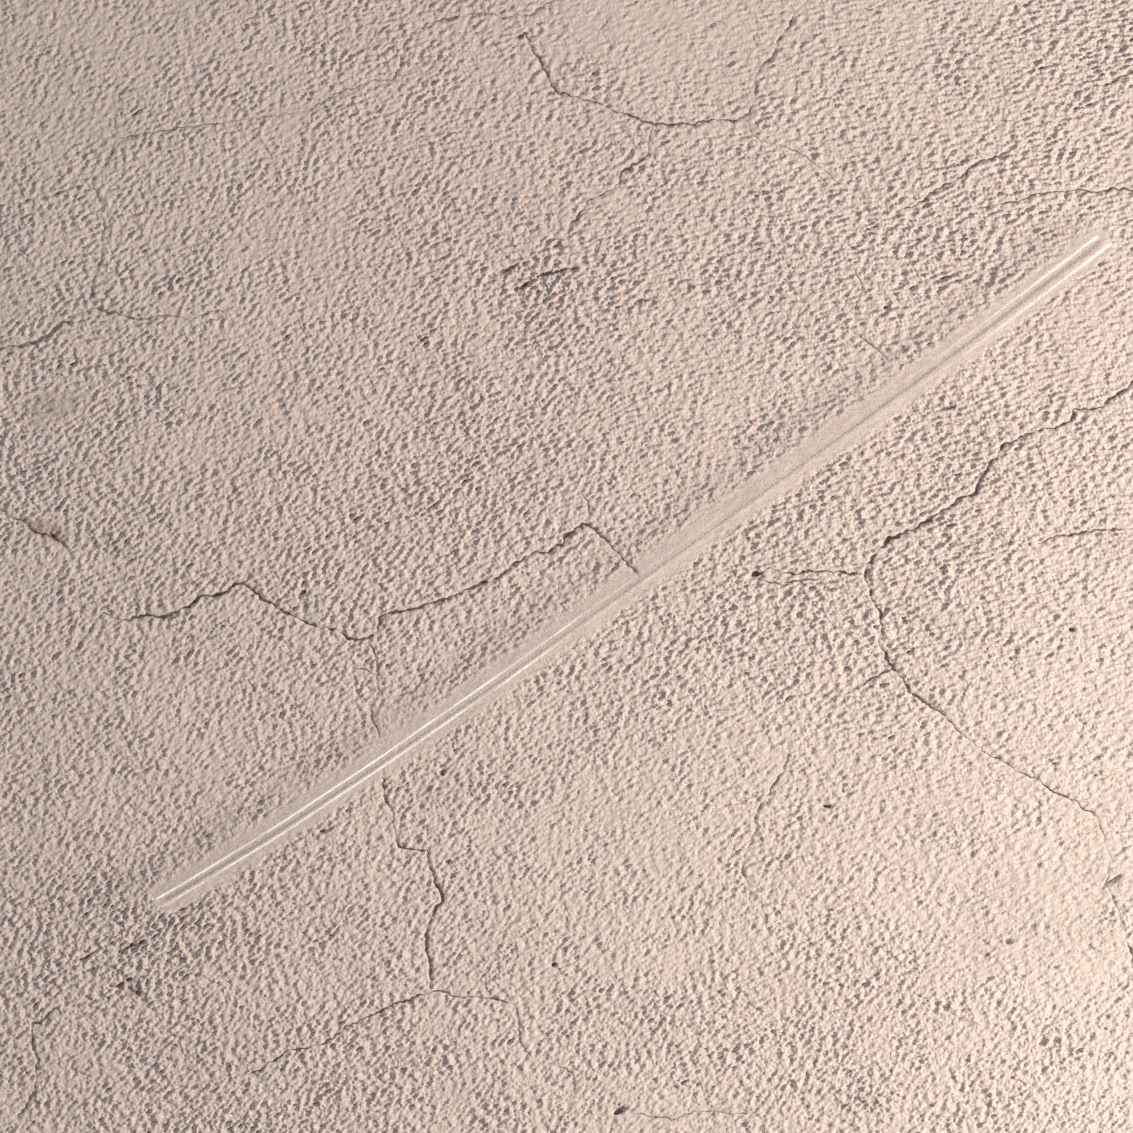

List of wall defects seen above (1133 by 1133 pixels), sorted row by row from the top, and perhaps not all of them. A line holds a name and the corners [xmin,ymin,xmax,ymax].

crack [0,0,838,350]
crack [904,57,1007,209]
crack [978,187,1133,209]
crack [854,268,891,361]
crack [0,509,66,547]
crack [71,494,638,738]
crack [755,380,1133,968]
crack [742,737,790,902]
crack [248,770,576,1133]
crack [18,1005,60,1118]
crack [638,1110,749,1121]